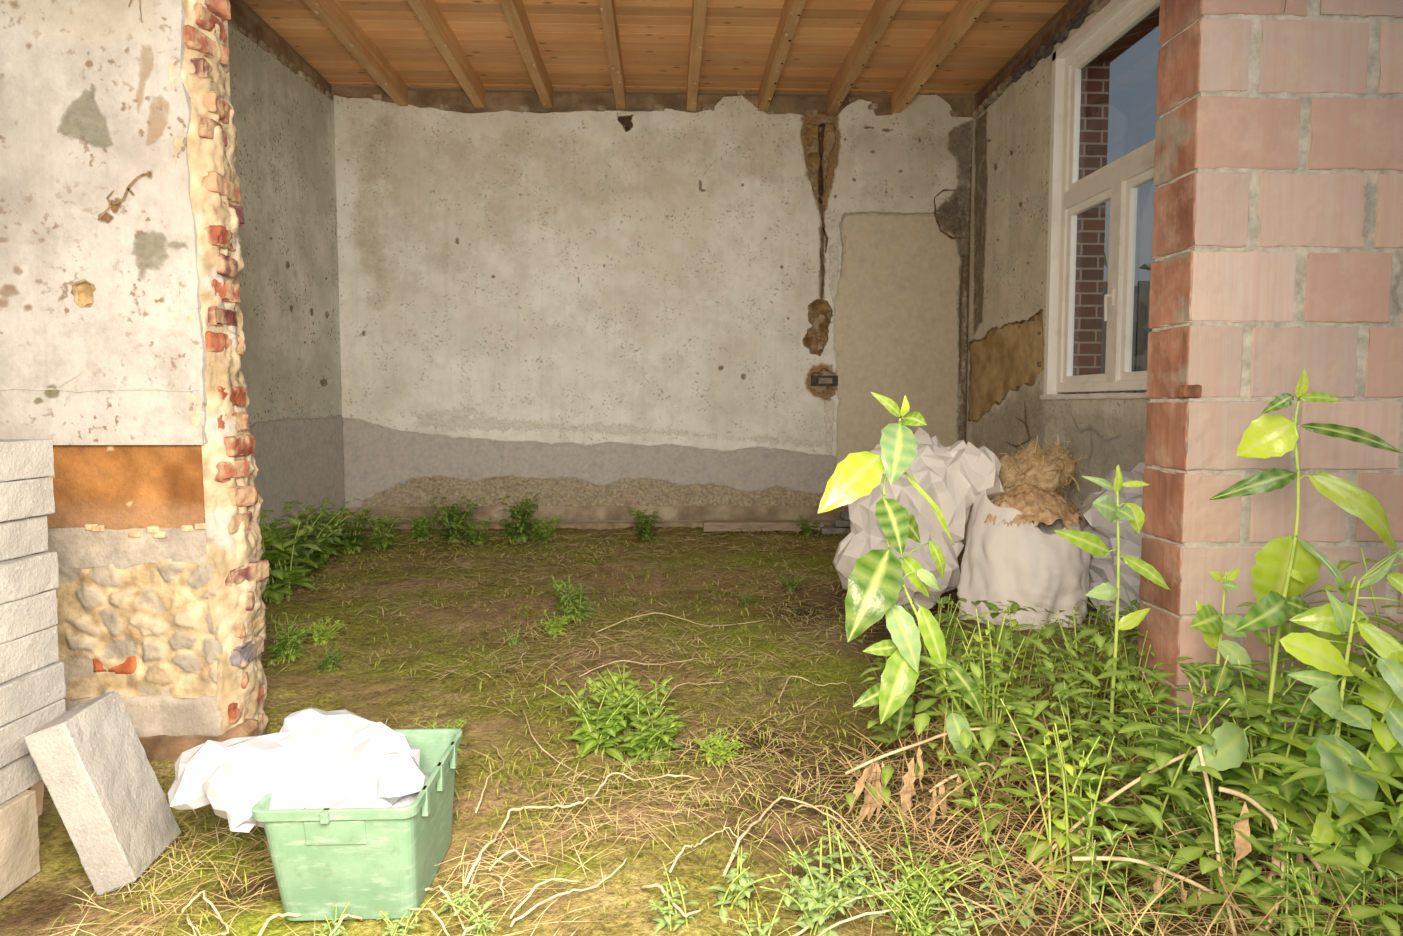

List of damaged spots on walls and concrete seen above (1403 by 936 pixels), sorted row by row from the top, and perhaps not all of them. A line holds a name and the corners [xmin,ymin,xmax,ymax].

rust [99,198,121,223]
spalling [44,0,892,761]
flaking render [968,309,1044,423]